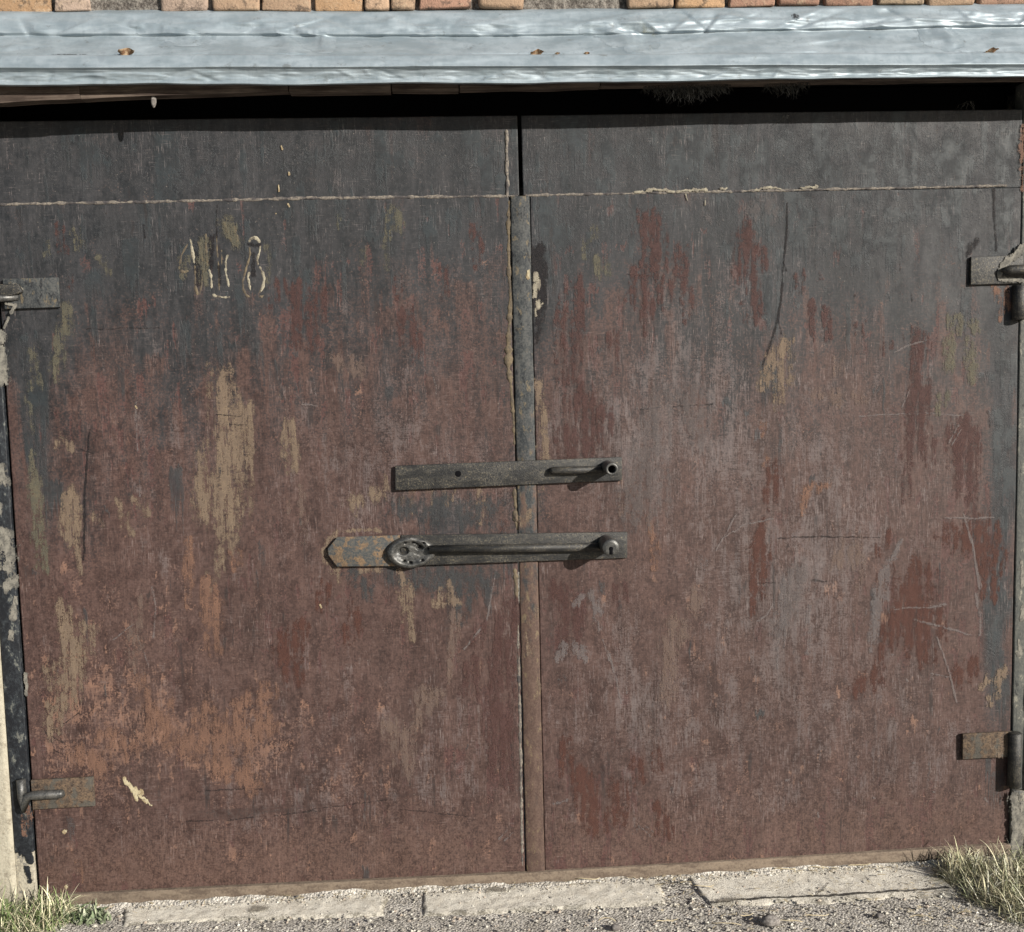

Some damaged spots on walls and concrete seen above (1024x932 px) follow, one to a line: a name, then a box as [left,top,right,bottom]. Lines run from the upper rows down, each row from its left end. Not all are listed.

corrosion [624,207,695,337]
corrosion [553,275,614,459]
peeling [0,462,11,487]
peeling [0,502,21,641]
peeling [42,597,99,743]
peeling [66,593,280,806]
peeling [182,362,255,657]
corrosion [745,461,785,620]
corrosion [848,555,947,700]
corrosion [880,325,1009,606]
corrosion [559,735,664,839]